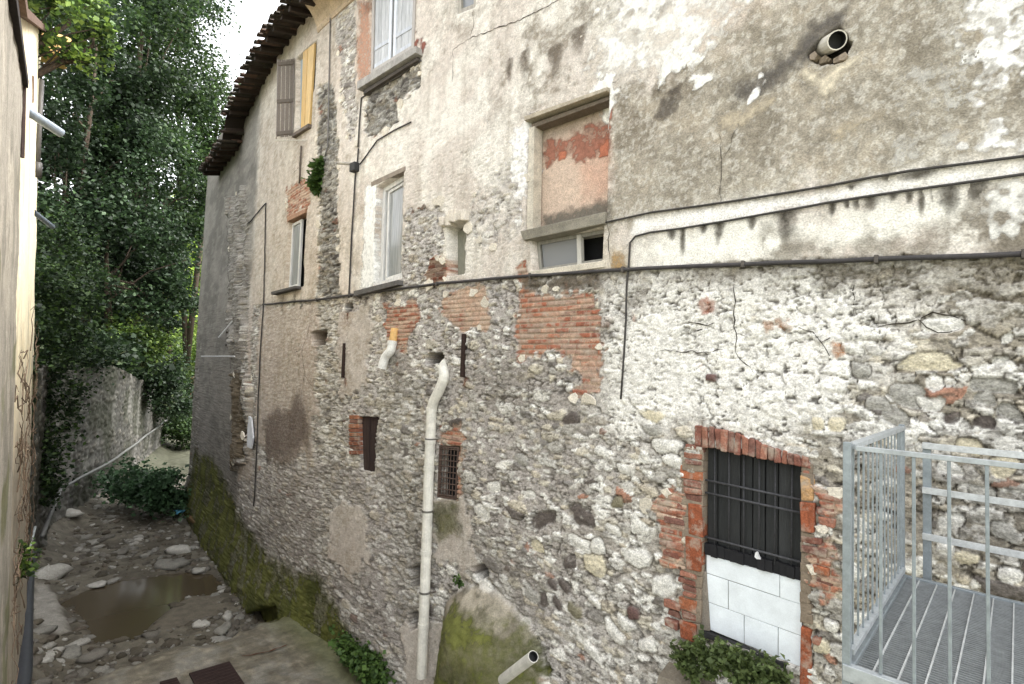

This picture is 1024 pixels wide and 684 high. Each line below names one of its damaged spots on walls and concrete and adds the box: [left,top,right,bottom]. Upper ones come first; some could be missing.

spalling [332,0,392,150]
crack [452,0,558,78]
peeling [543,0,753,169]
damp [655,87,679,119]
damp [721,14,859,128]
damp [778,211,793,235]
damp [830,185,875,213]
damp [891,171,929,210]
damp [943,182,985,207]
spalling [383,196,490,353]
spalling [515,260,609,405]
crack [872,312,966,333]